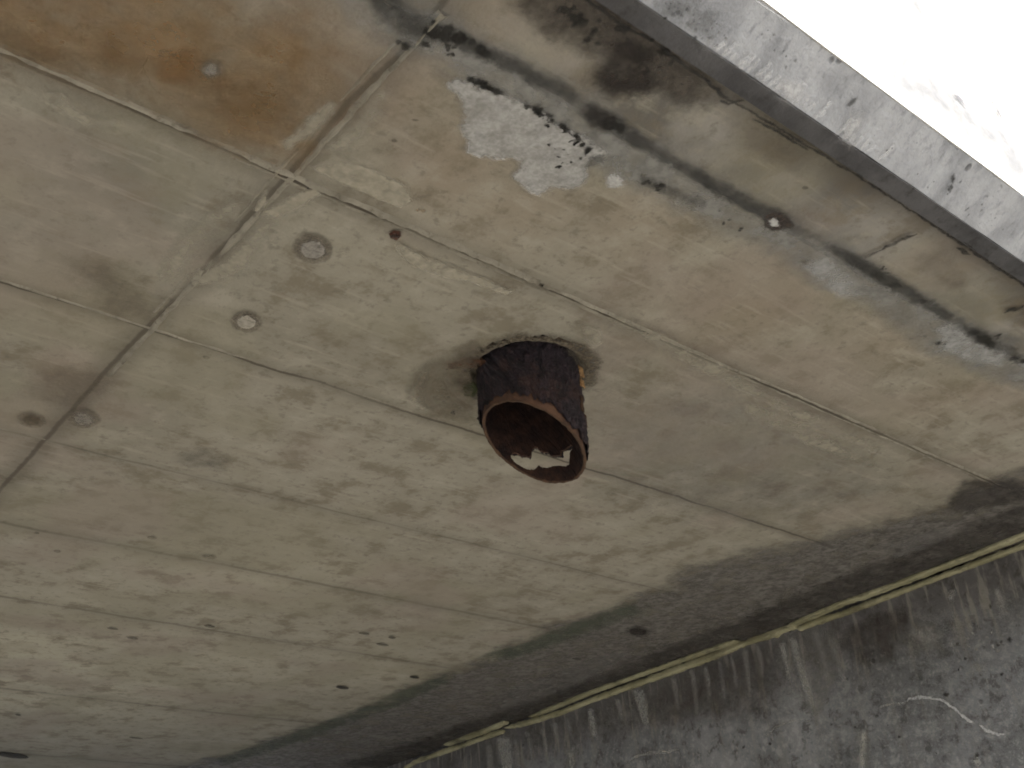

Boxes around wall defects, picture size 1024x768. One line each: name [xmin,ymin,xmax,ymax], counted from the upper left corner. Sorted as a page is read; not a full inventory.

peeling [448,80,607,194]
damp [372,0,1024,382]
damp [186,470,1024,768]